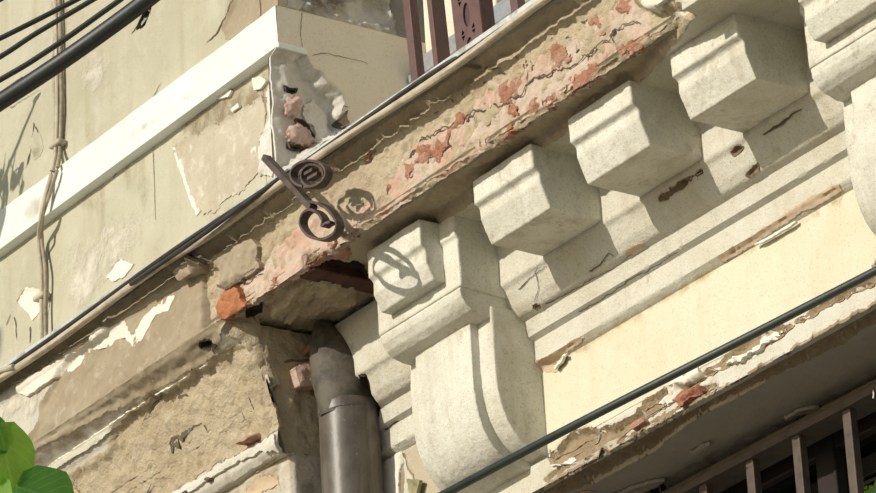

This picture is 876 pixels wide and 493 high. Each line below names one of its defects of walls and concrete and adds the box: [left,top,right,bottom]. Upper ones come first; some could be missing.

crack [463,63,500,71]
crack [763,109,802,135]
flaking render [658,169,703,202]
flaking render [0,0,696,493]
crack [518,246,678,312]
flaking render [540,300,876,493]